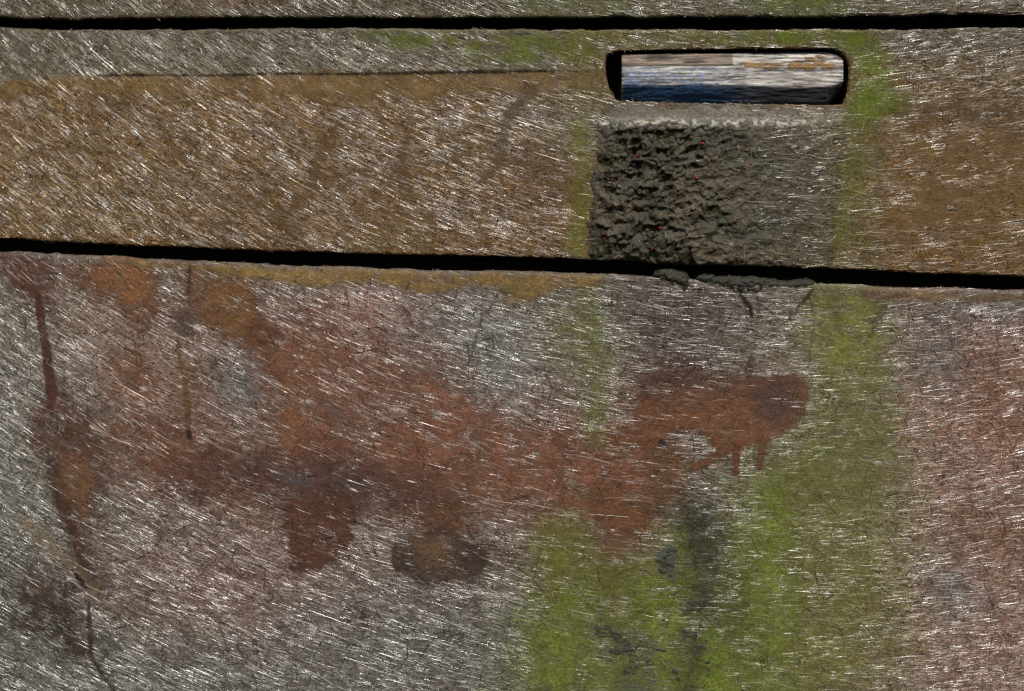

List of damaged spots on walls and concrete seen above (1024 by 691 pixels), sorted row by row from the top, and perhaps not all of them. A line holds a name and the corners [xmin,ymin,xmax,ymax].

rust [65,259,158,321]
spalling [582,67,846,268]
rust [1,255,106,589]
rust [109,322,809,585]